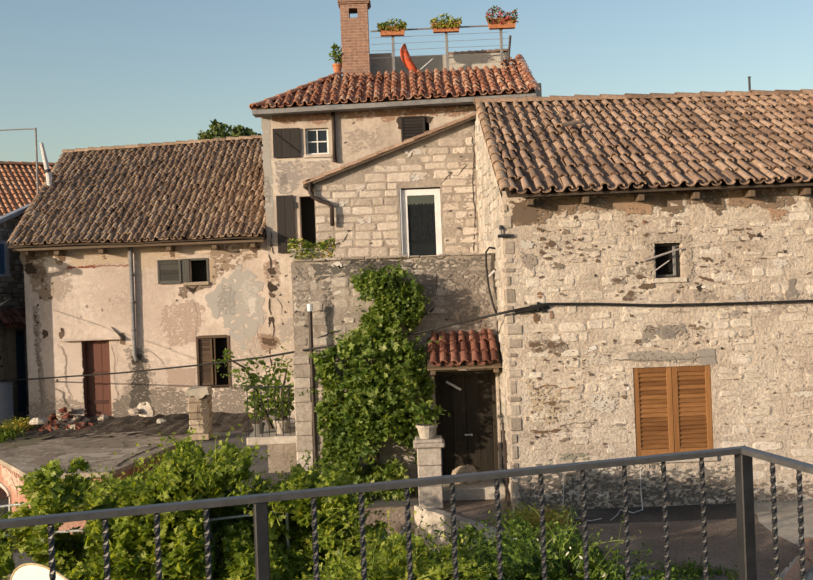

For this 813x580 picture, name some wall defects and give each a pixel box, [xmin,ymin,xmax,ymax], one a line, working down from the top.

spalling [267,262,298,313]
spalling [19,250,95,413]
water stain [112,345,190,417]